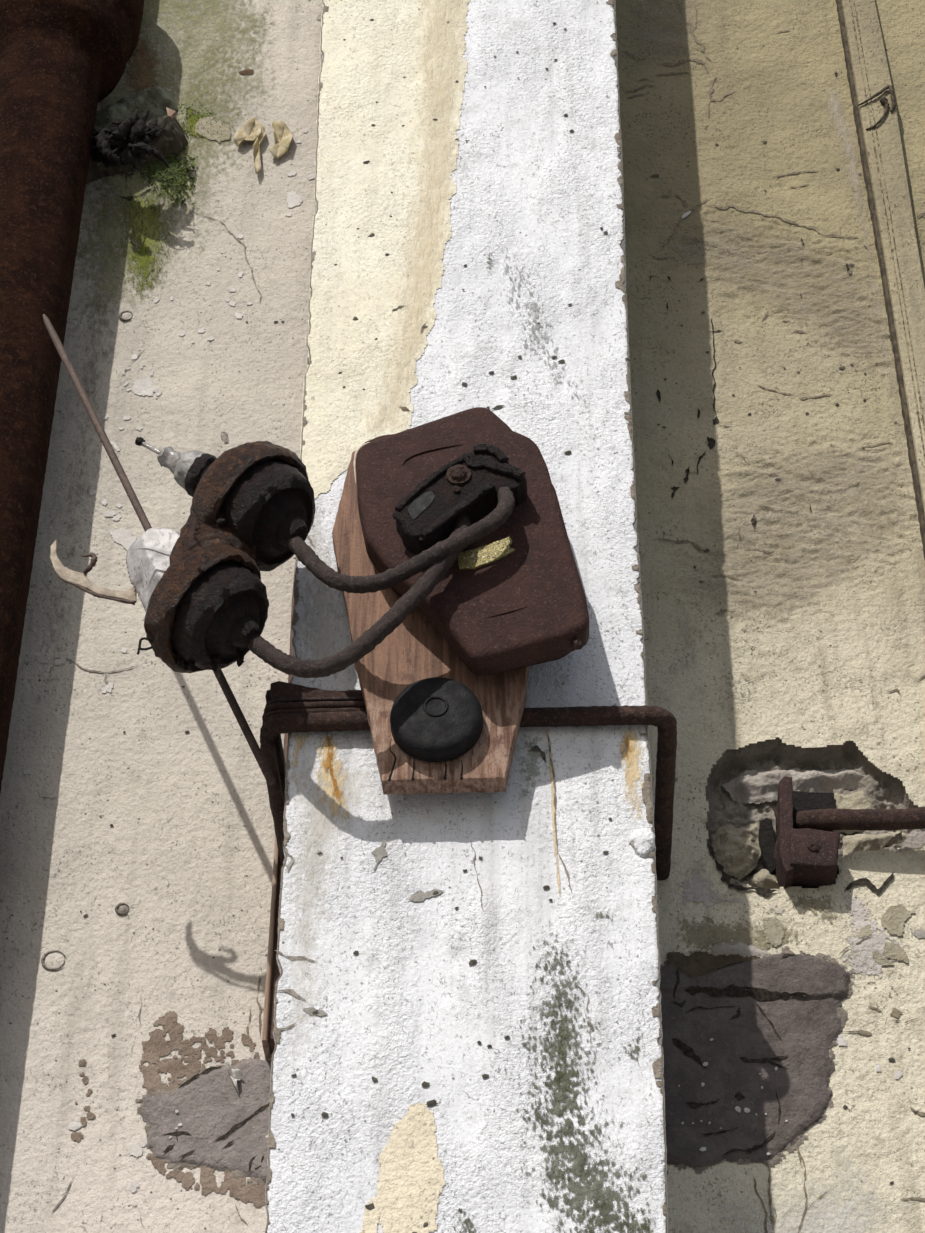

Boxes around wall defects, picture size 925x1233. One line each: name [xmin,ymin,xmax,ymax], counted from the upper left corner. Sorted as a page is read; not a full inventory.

leakage [123,197,166,294]
crack [120,175,261,301]
peeling [195,0,470,499]
crack [659,319,893,580]
corrosion [317,736,347,816]
peeling [135,733,291,1233]
peeling [359,1081,445,1233]
leakage [542,1006,587,1116]
leakage [624,993,645,1064]
leakage [624,1208,655,1233]
crack [670,969,828,1233]
spalling [648,737,925,1233]